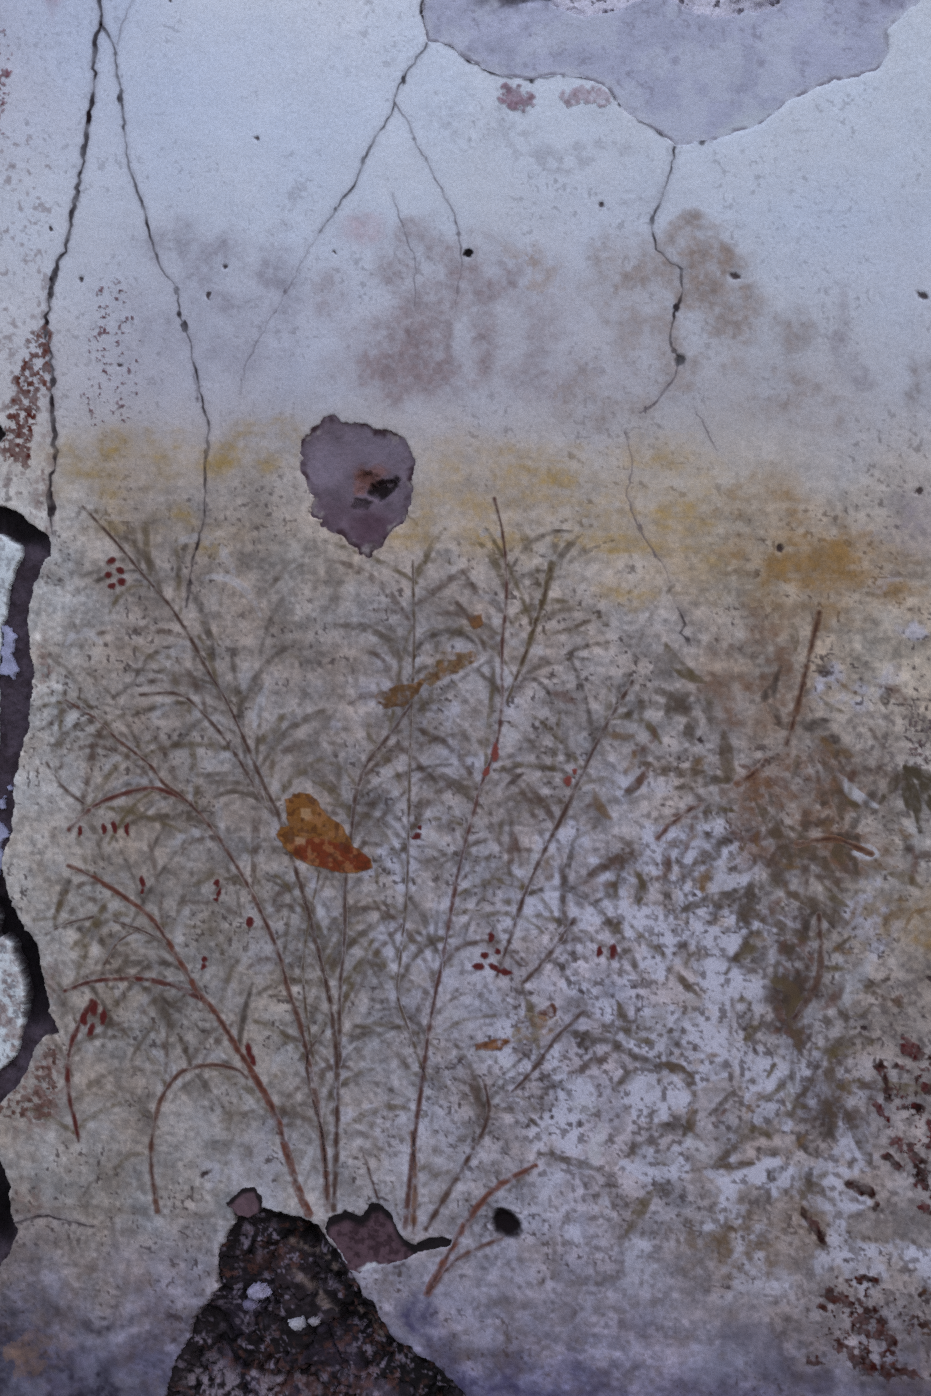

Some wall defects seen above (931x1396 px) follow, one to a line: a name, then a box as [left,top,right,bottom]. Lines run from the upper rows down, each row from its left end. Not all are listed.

spalling [422,0,919,145]
crack [238,0,718,647]
crack [0,0,211,1103]
spalling [300,415,415,558]
peeling [0,1045,59,1121]
crack [0,1161,96,1266]
spalling [166,1187,466,1396]